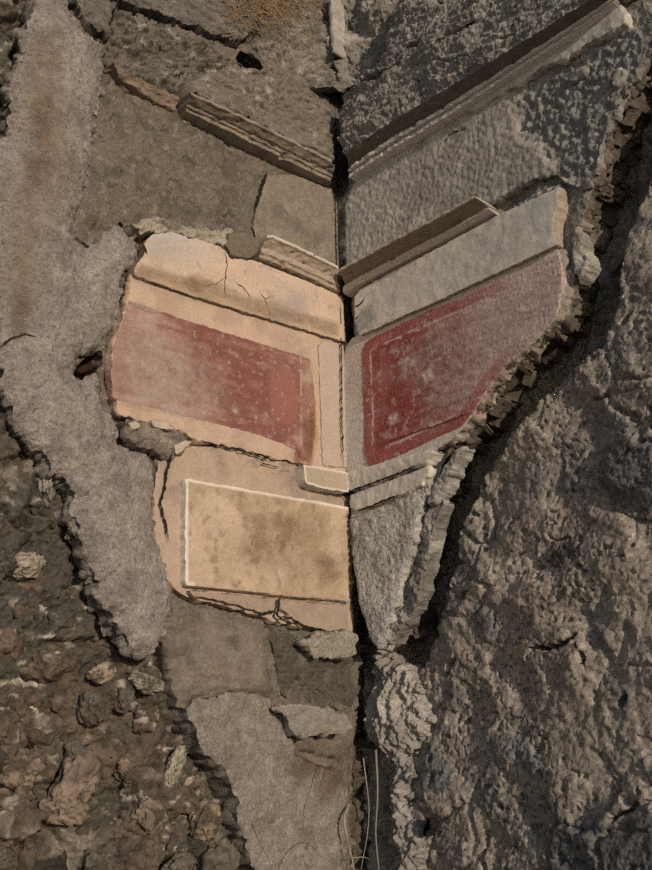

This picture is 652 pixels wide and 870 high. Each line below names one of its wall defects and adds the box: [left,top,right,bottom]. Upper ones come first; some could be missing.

crack [208,251,270,314]
crack [159,454,172,541]
crack [260,596,303,625]